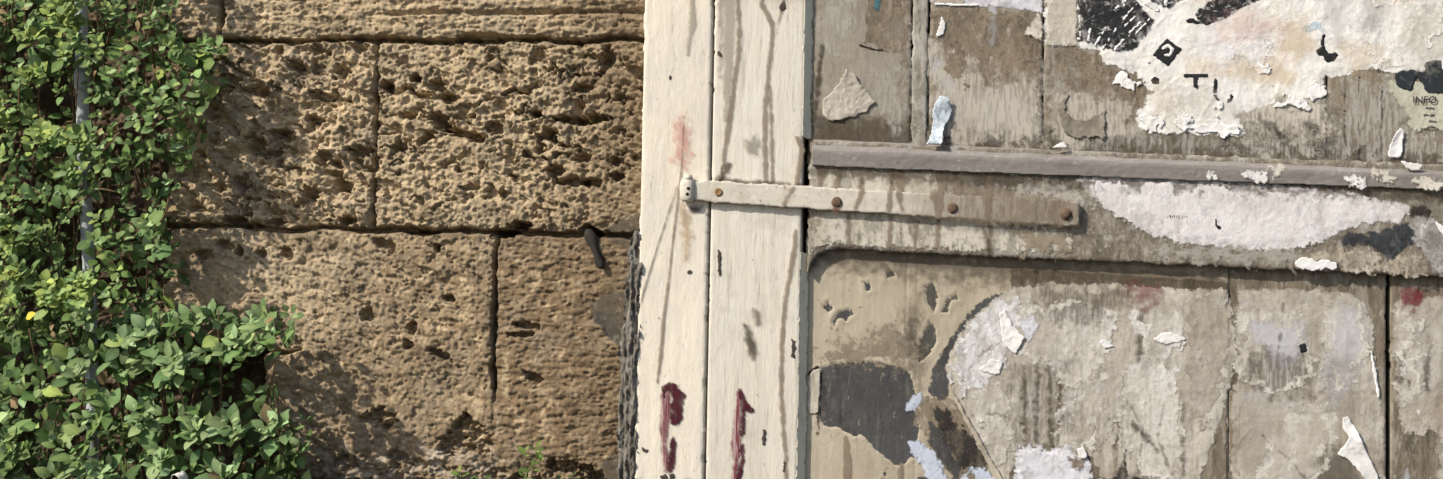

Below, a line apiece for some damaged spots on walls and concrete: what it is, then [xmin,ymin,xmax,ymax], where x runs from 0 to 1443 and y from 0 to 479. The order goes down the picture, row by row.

peeling [807,283,1003,476]